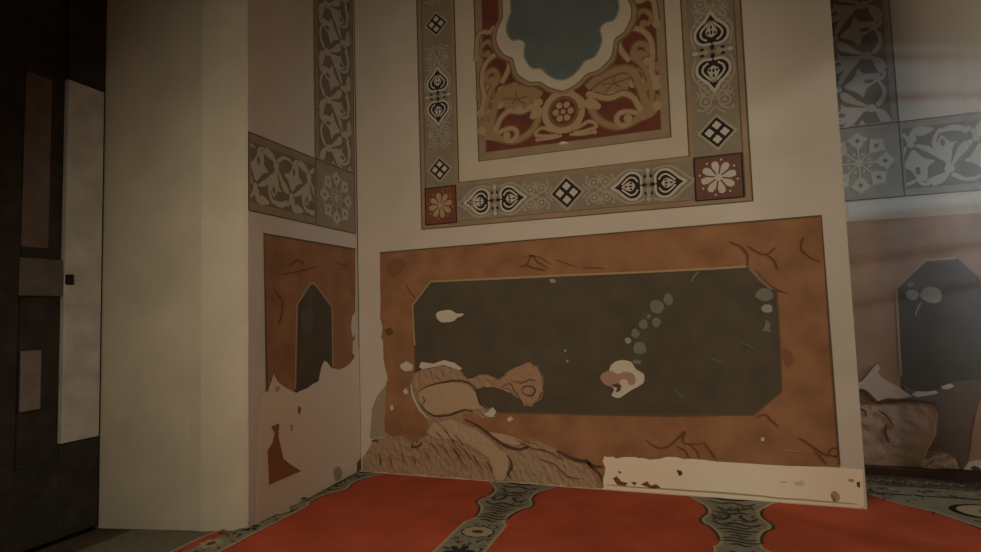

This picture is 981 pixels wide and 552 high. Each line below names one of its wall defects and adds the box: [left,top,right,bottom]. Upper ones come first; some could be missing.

crack [729,241,789,294]
peeling [255,312,954,524]